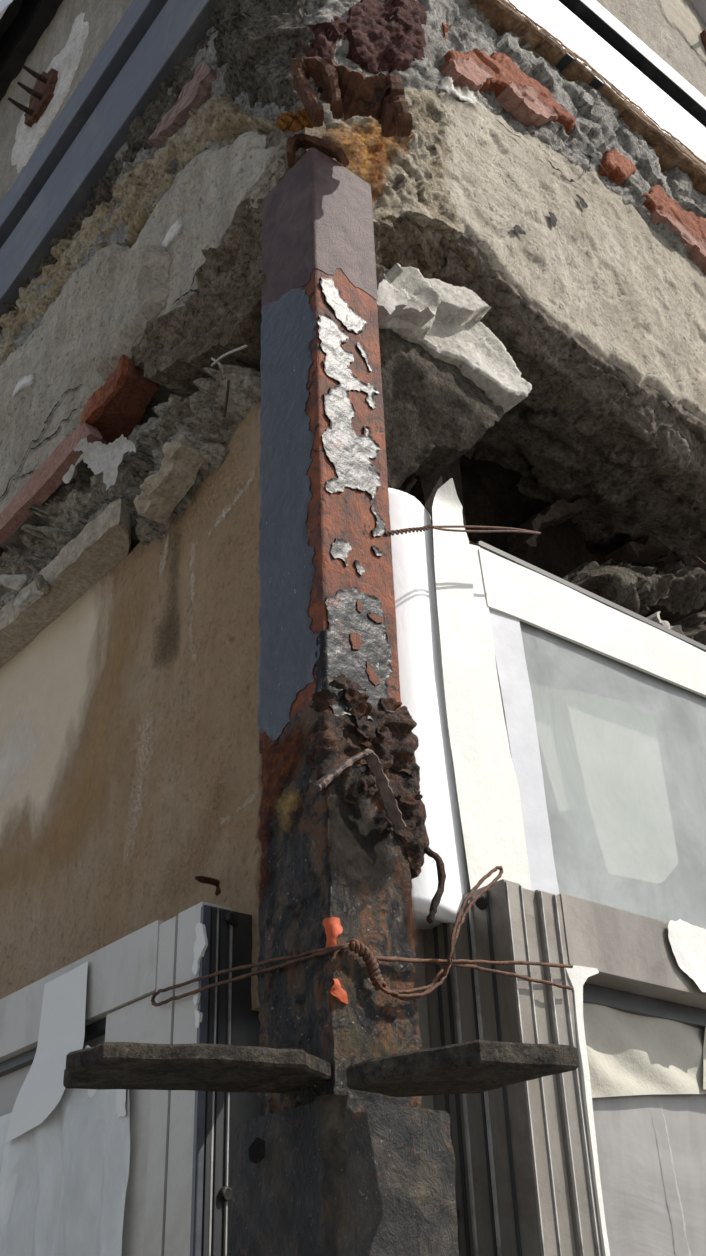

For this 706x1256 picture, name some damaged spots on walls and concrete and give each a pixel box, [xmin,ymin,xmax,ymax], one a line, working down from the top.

peeling [660,0,706,61]
rust [327,118,412,198]
spalling [322,48,706,623]
crack [0,380,87,498]
peeling [62,137,395,741]
flaking render [647,611,685,636]
rust [256,674,446,942]